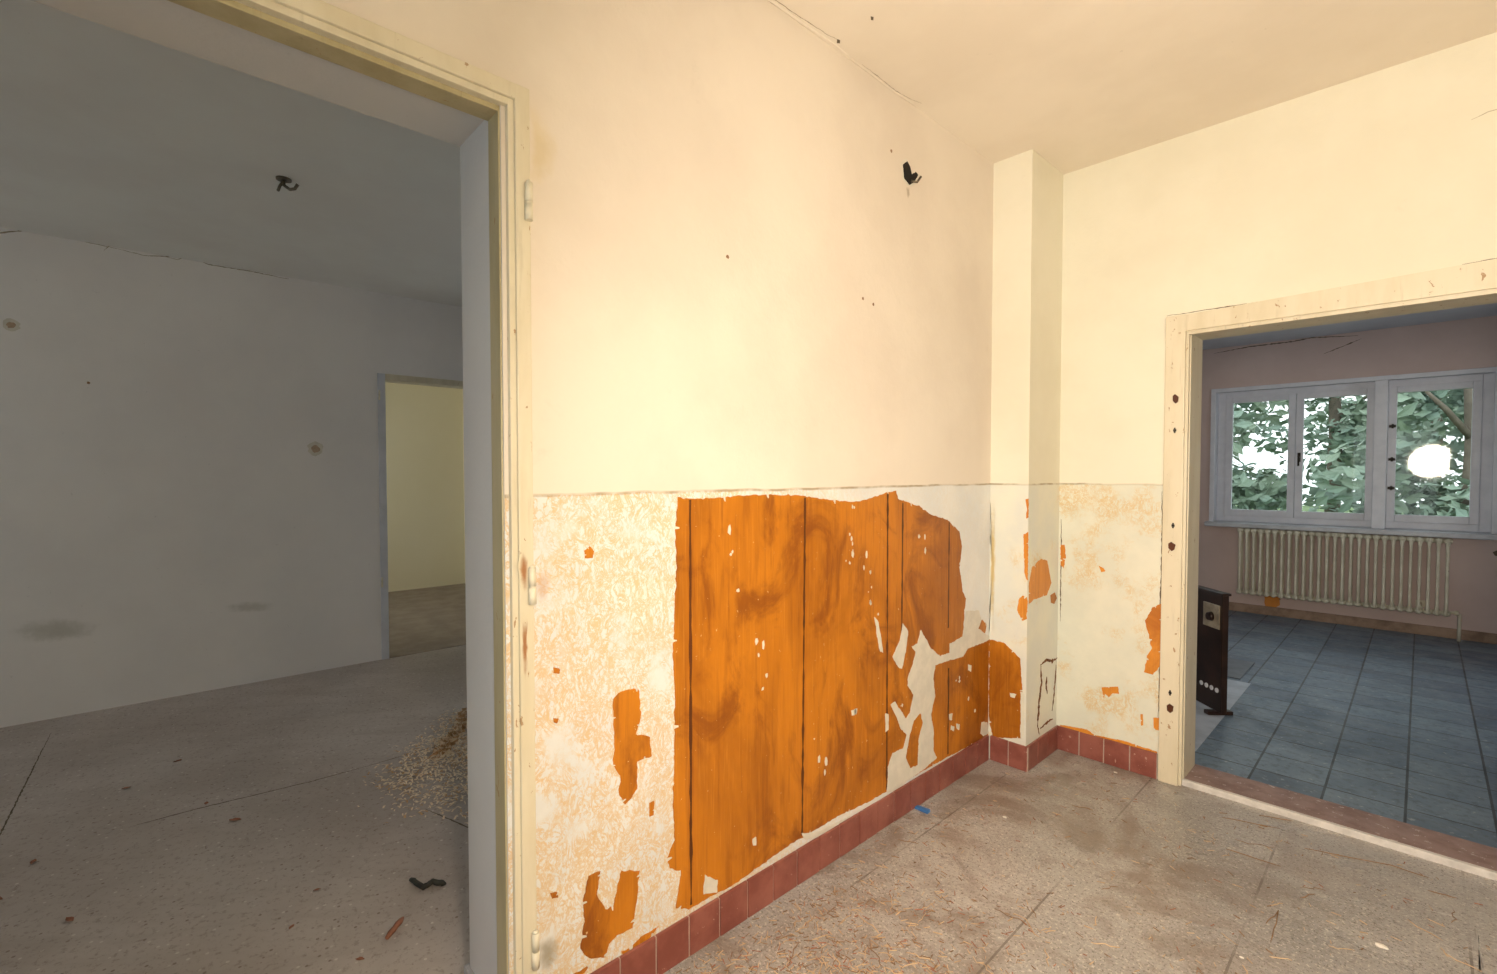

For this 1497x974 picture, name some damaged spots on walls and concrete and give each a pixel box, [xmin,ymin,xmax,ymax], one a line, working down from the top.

peeling [1017,499,1066,621]
peeling [1144,604,1161,675]
peeling [612,687,652,804]
peeling [666,491,1025,910]
peeling [574,870,657,974]